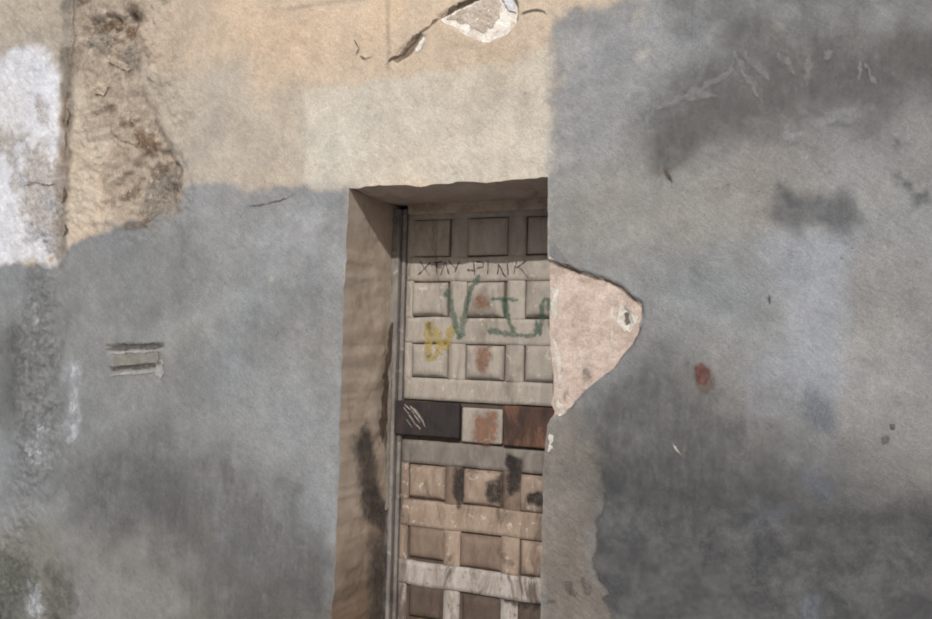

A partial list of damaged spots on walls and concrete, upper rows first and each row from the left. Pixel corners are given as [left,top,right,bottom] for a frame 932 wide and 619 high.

flaking render [385,0,547,65]
flaking render [75,0,182,228]
peeling [548,240,643,417]
water stain [24,412,53,470]
water stain [66,365,81,441]
corrosion [694,363,713,392]
water stain [354,426,388,619]
water stain [593,397,932,619]
water stain [27,589,44,617]